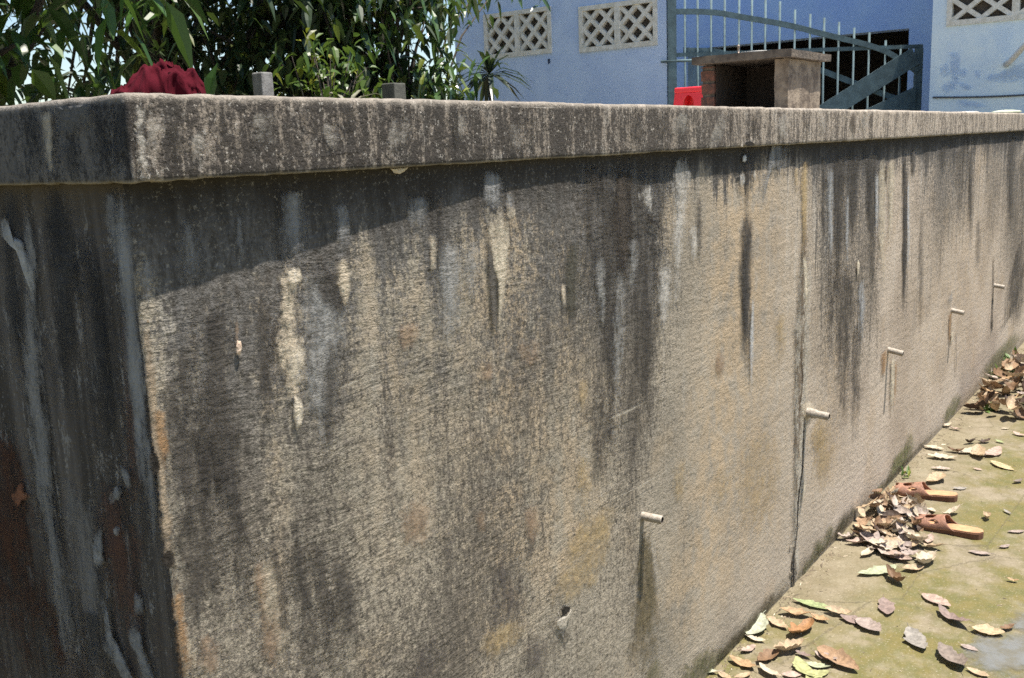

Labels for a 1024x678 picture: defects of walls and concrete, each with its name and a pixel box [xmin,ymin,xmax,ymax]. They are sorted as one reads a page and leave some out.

damp [6,201,68,626]
damp [110,204,154,519]
damp [431,238,476,333]
damp [488,248,497,326]
damp [562,169,701,470]
damp [741,199,754,378]
crack [789,220,811,586]
damp [822,157,878,404]
damp [903,149,922,300]
damp [1007,242,1024,320]
spalling [557,605,572,638]
damp [807,509,855,566]